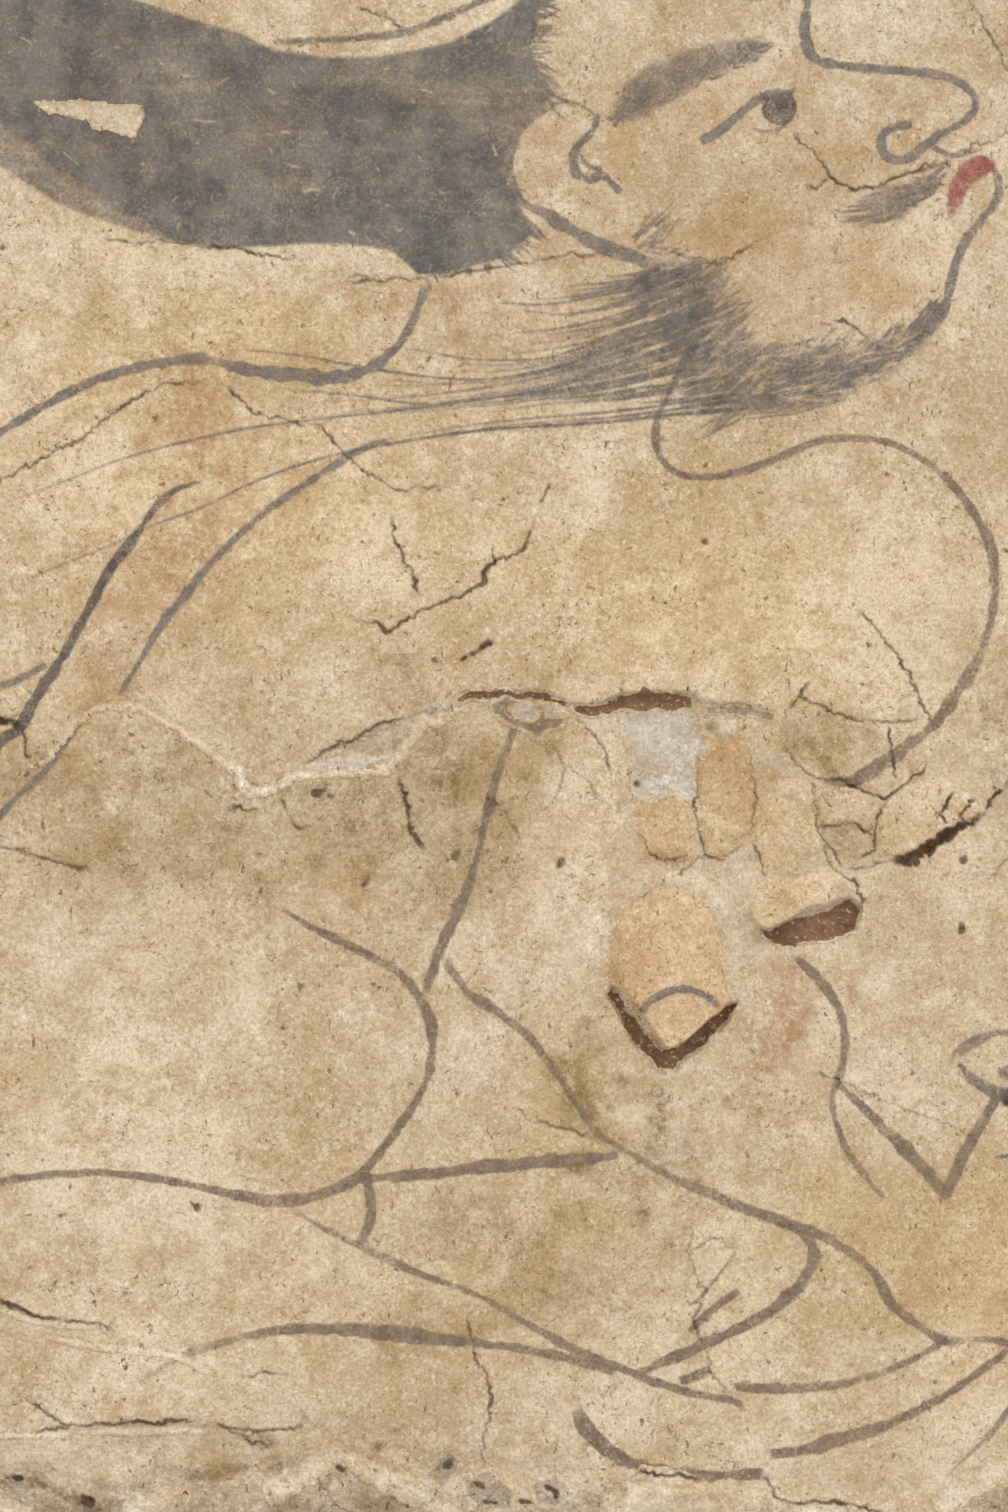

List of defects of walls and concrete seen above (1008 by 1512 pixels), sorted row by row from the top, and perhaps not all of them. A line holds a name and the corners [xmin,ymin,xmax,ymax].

crack [0,383,179,481]
crack [228,389,550,635]
crack [0,717,29,757]
crack [792,615,1002,902]
crack [398,780,421,846]
peeling [0,1430,72,1440]
peeling [90,1424,209,1437]
flaking render [0,1440,697,1512]
flaking render [787,1498,879,1512]
flaking render [924,1455,1008,1512]